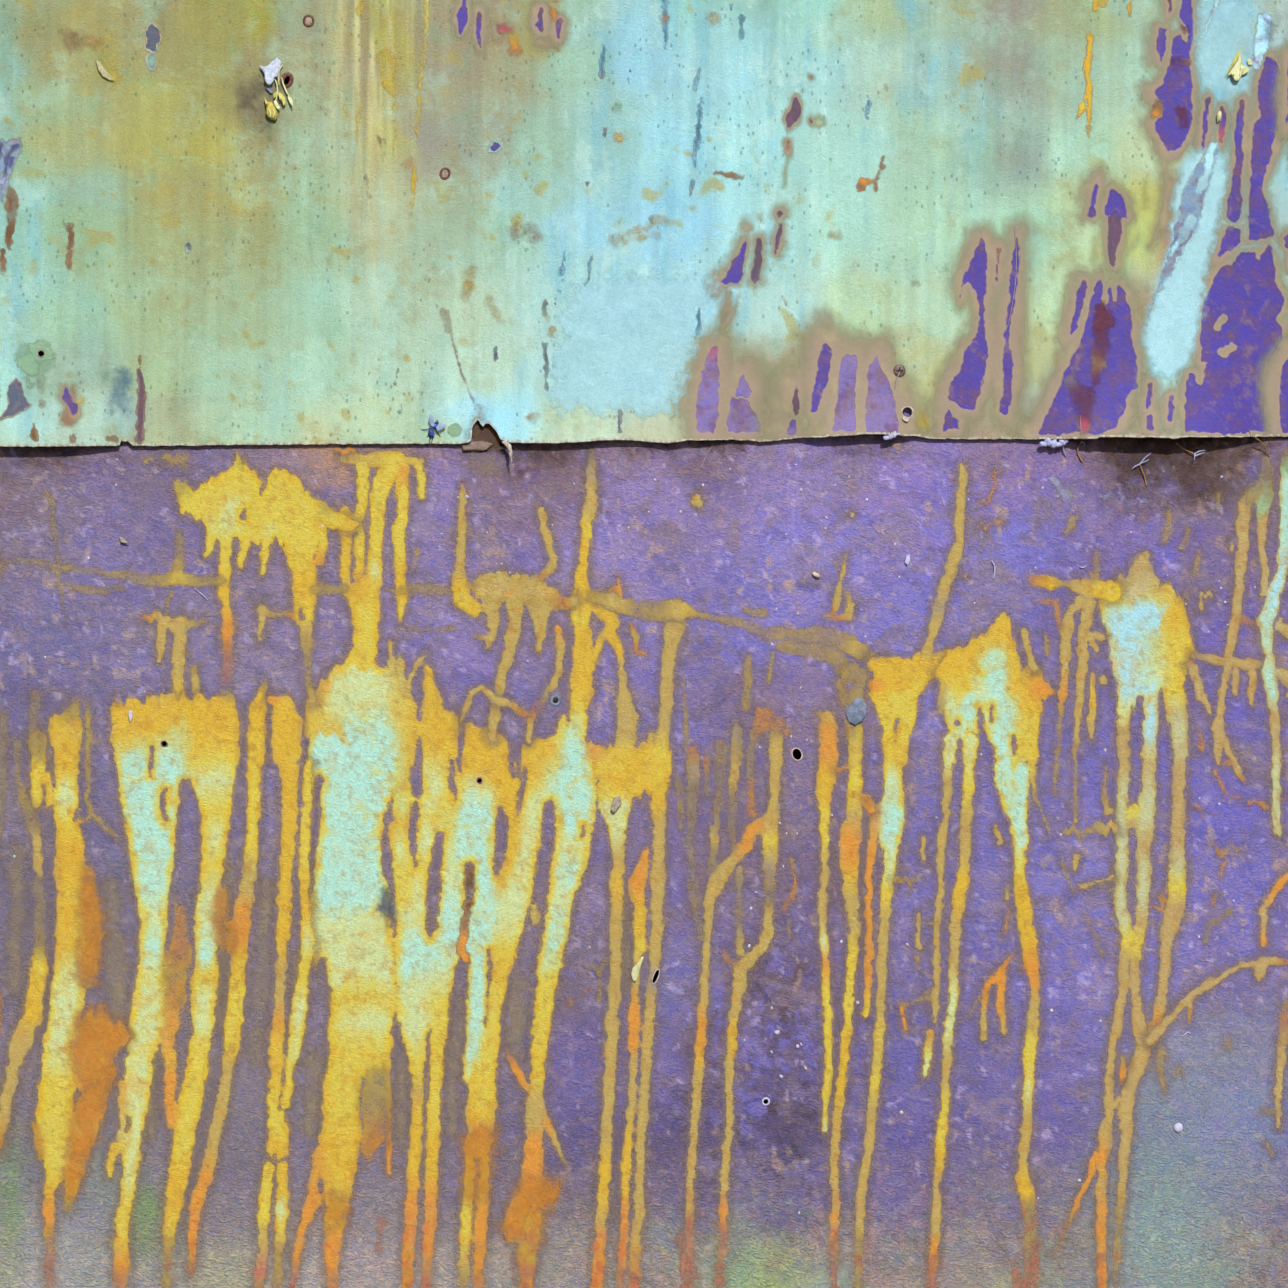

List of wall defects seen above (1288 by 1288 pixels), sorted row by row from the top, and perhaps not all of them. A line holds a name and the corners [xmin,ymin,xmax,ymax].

corrosion [1092,0,1108,12]
corrosion [1077,32,1094,126]
peeling [0,137,22,202]
corrosion [714,171,741,179]
corrosion [856,156,885,192]
peeling [676,0,1288,441]
peeling [0,378,31,420]
corrosion [456,867,474,963]